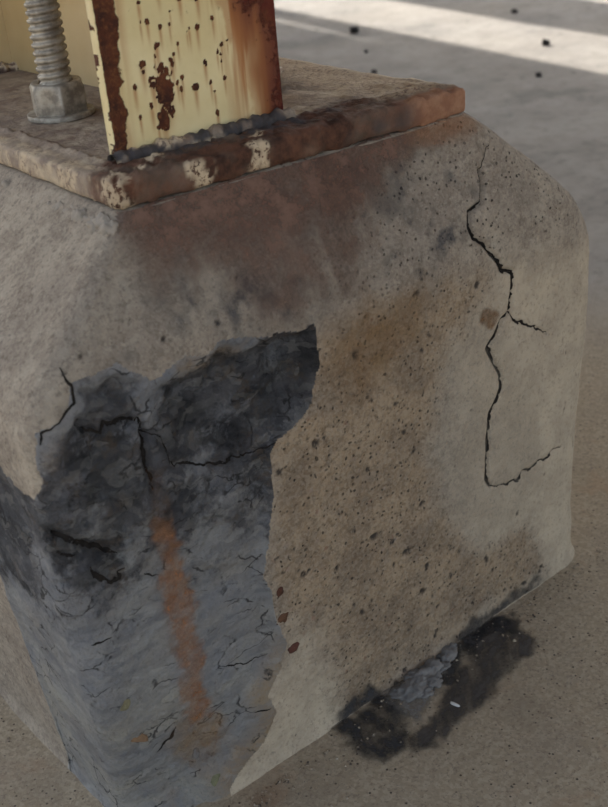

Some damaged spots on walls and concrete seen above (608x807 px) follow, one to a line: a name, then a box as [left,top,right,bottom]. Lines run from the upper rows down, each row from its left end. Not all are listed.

crack [40,367,275,489]
spalling [0,323,320,807]
water stain [340,576,538,749]
crack [467,145,561,487]